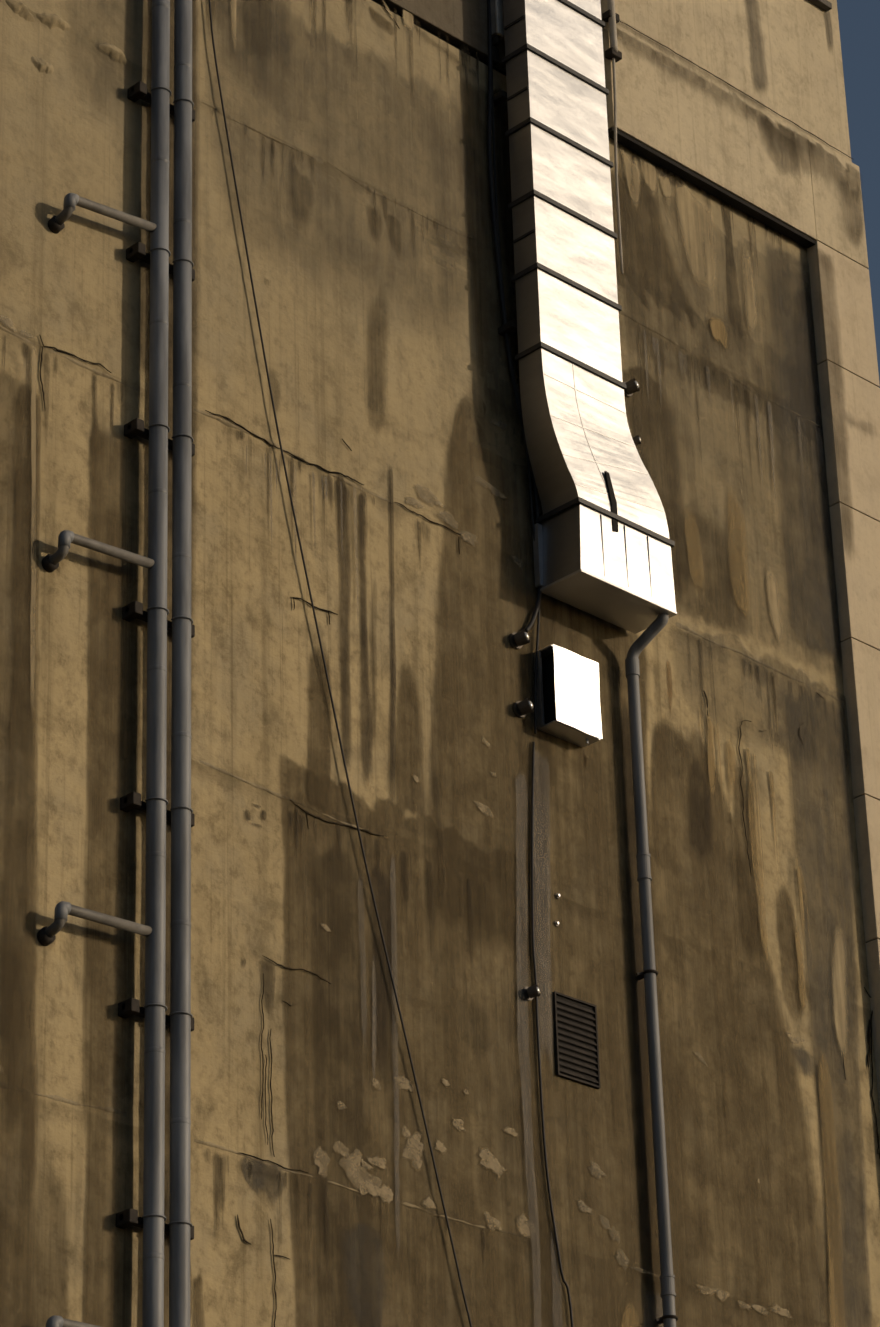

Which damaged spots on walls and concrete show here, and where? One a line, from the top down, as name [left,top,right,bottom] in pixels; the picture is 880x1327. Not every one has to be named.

leakage [370,1,413,28]
leakage [192,0,214,117]
crack [40,336,112,408]
crack [205,410,364,485]
crack [395,502,461,554]
leakage [264,44,871,1327]
leakage [87,385,142,1116]
leakage [0,349,47,1327]
crack [291,800,384,836]
leakage [164,656,172,1308]
spalling [315,1142,393,1204]
spalling [402,1127,446,1169]